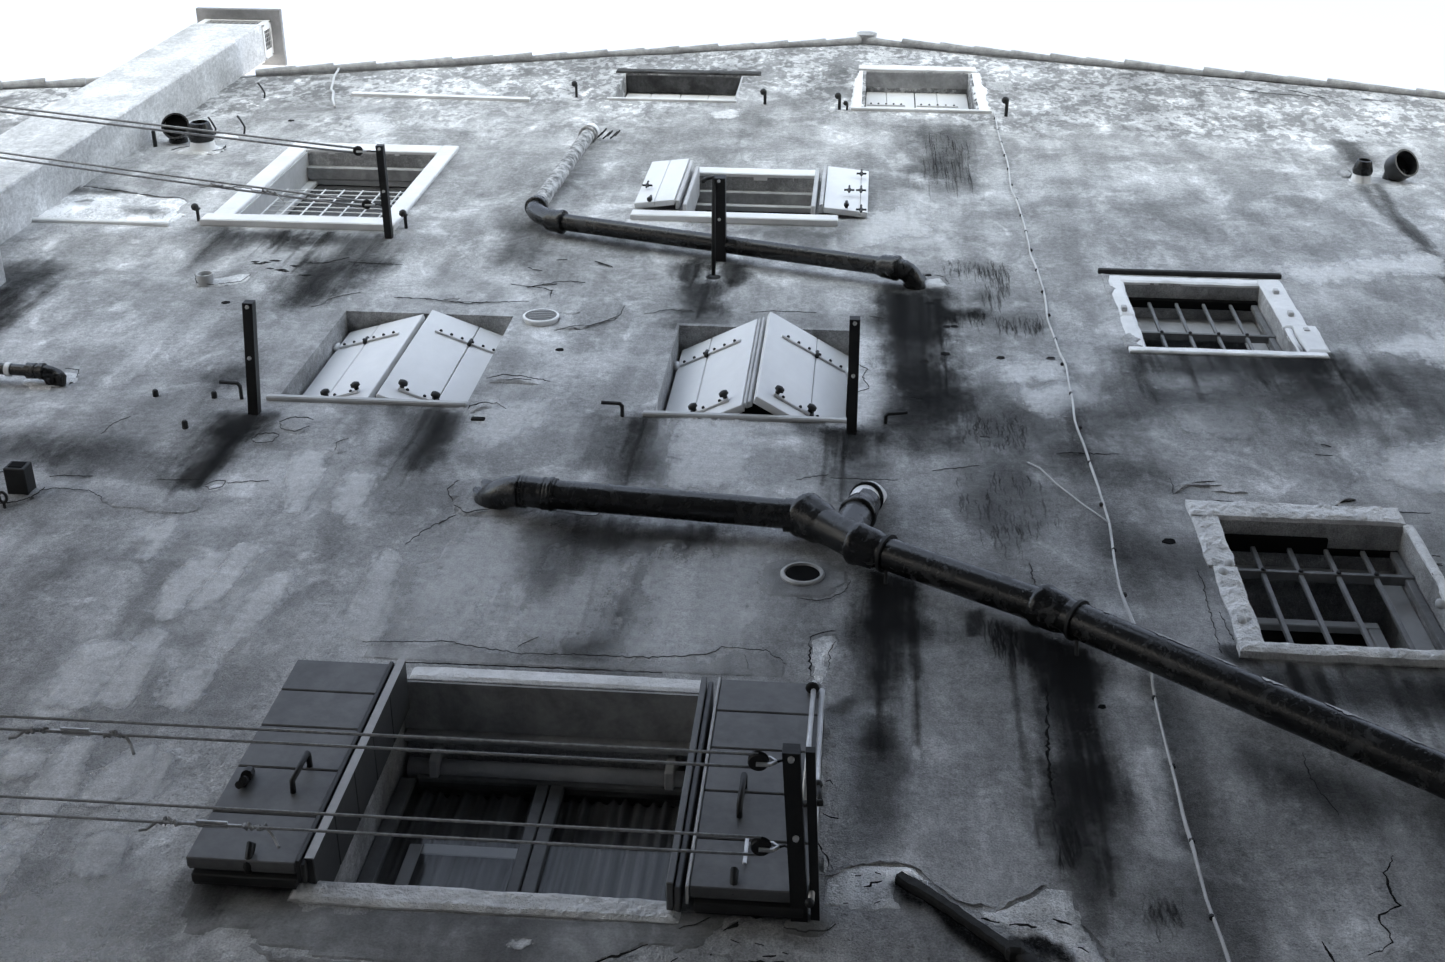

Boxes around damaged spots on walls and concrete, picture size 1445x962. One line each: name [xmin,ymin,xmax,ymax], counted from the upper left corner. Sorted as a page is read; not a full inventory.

damp [625,219,691,230]
damp [838,208,929,246]
damp [826,289,981,491]
damp [999,361,1099,414]
damp [1121,353,1328,438]
damp [846,571,934,702]
damp [1003,627,1116,838]
spalling [808,630,1119,962]
crack [1322,942,1335,962]
crack [1369,855,1402,955]